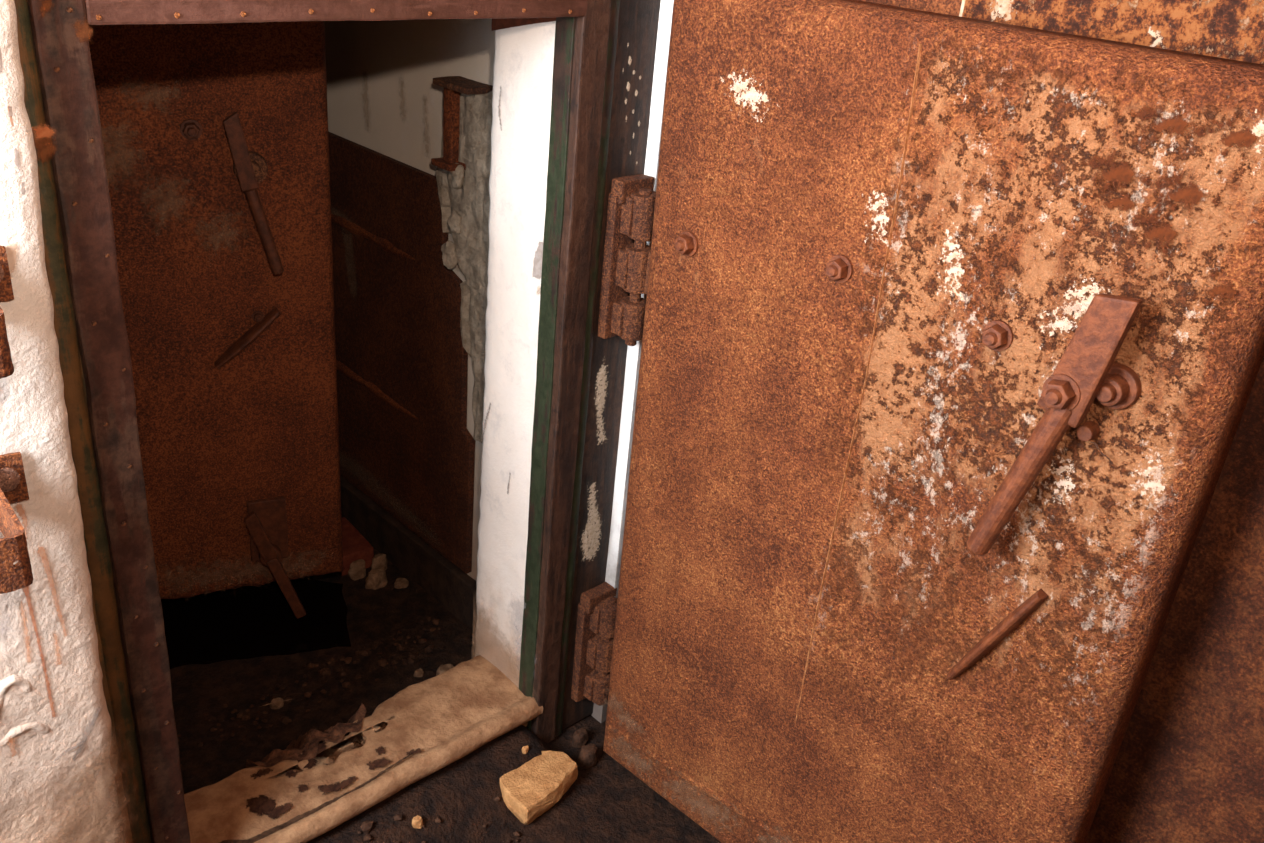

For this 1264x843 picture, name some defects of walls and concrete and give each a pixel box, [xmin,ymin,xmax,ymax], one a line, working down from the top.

corrosion [1112,90,1257,160]
corrosion [1082,149,1220,257]
peeling [5,244,17,277]
spalling [436,90,493,444]
corrosion [1193,268,1237,306]
corrosion [21,547,67,717]